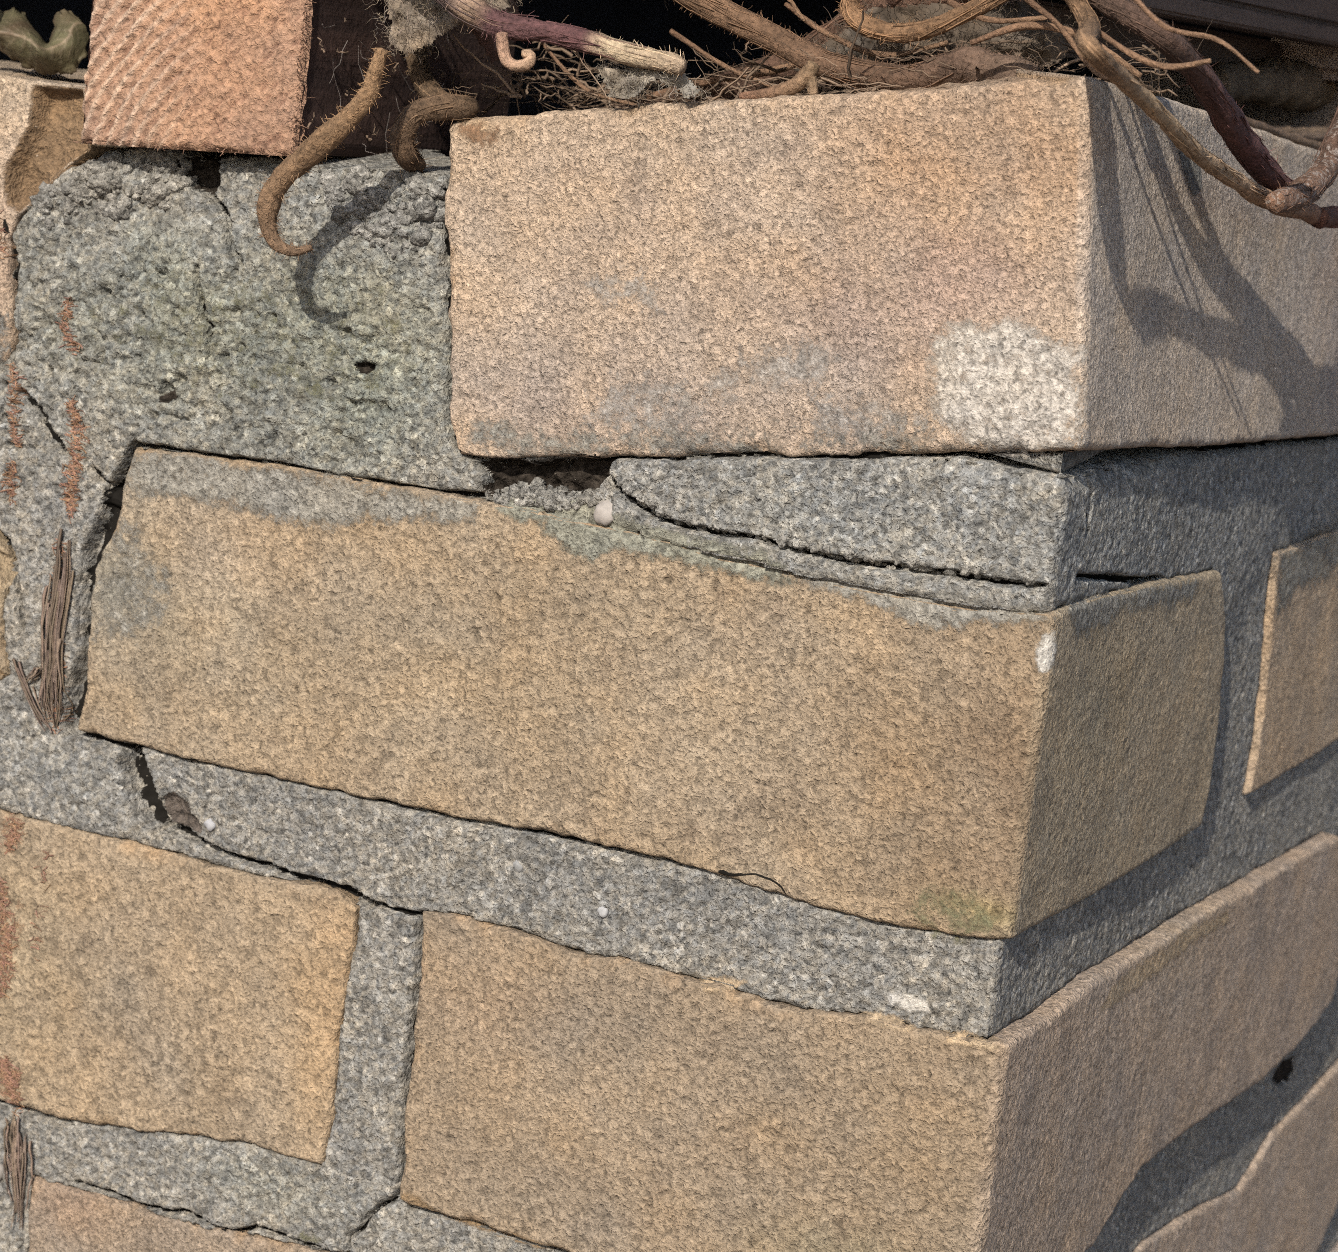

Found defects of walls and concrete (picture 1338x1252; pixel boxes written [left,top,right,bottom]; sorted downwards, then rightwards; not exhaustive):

spalling [3,85,117,213]
crack [218,201,241,257]
crack [444,226,452,312]
crack [28,394,67,451]
crack [1159,434,1338,451]
crack [86,444,485,634]
crack [614,450,1075,586]
crack [1076,574,1161,583]
crack [75,680,423,916]
crack [338,790,623,849]